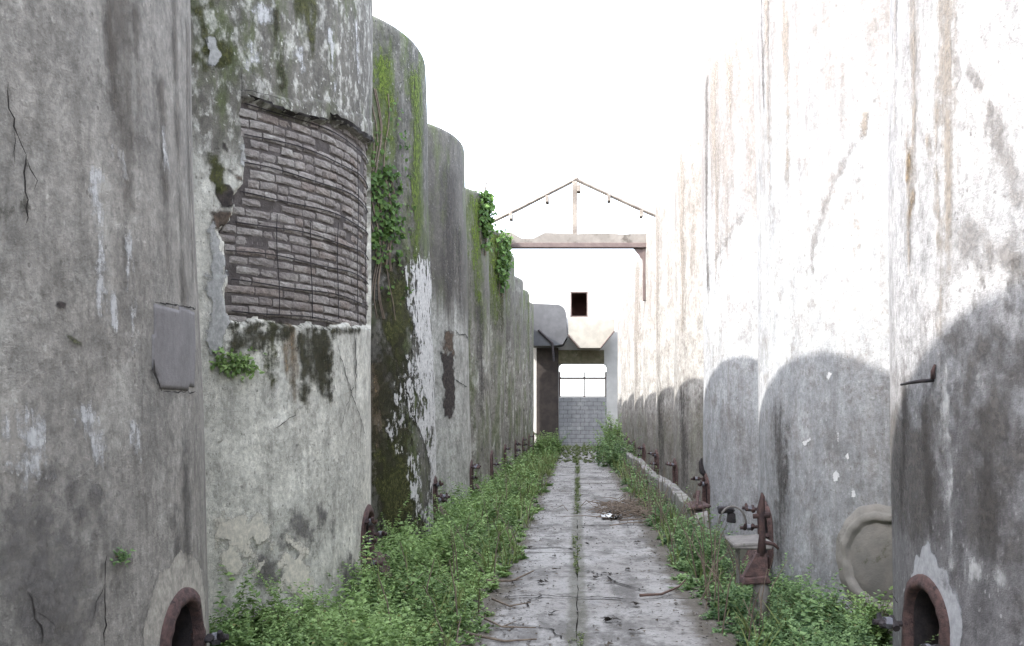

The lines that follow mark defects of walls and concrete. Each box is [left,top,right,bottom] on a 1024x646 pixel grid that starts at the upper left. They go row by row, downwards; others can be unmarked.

peeling [205,36,222,66]
crack [7,88,38,223]
spalling [204,68,373,355]
leakage [934,0,1020,278]
leakage [228,320,361,403]
peeling [386,248,455,534]
leakage [774,407,788,557]
leakage [889,320,1024,587]
crack [27,591,57,643]
crack [93,557,107,646]